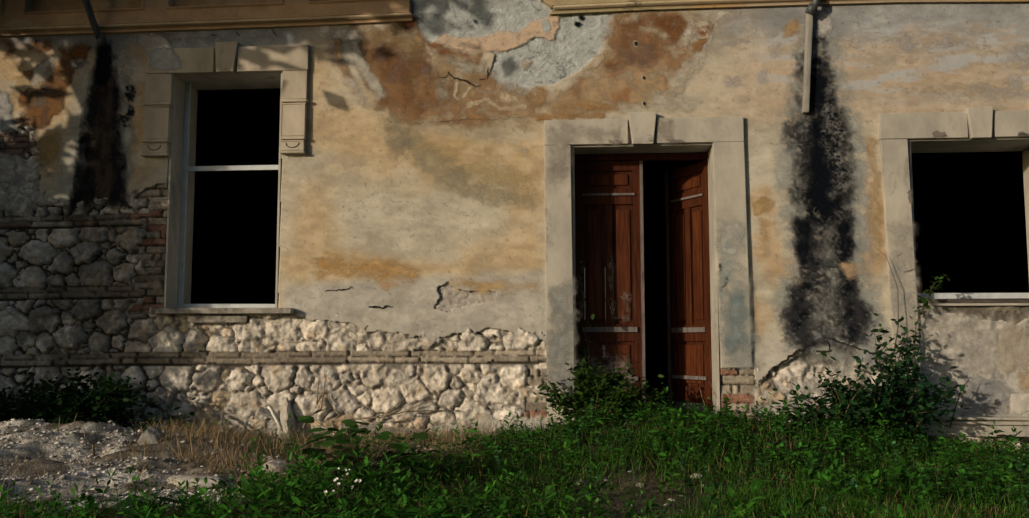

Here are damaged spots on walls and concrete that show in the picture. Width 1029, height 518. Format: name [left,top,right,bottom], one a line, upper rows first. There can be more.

peeling [413,0,668,95]
peeling [652,11,740,110]
damp [69,33,181,207]
damp [775,10,922,409]
flaking render [435,282,496,312]